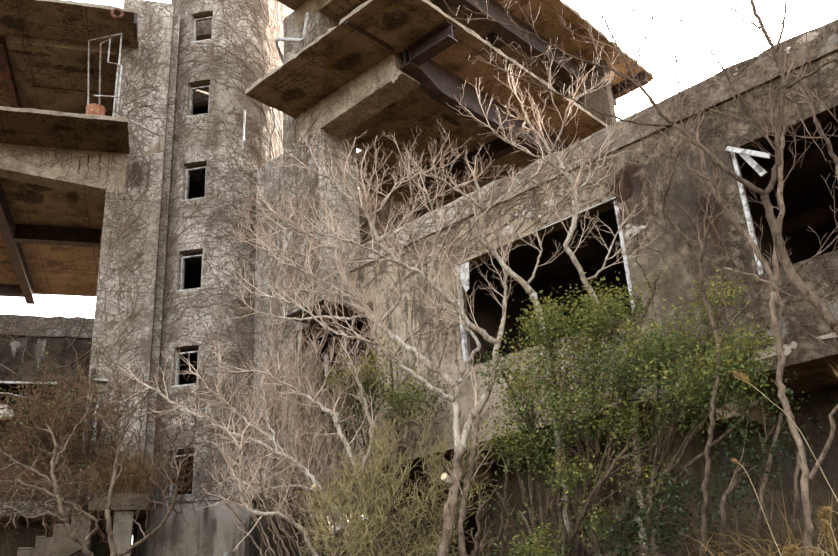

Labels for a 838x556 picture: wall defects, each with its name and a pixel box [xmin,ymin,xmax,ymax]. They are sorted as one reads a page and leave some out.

corrosion [612,164,654,227]